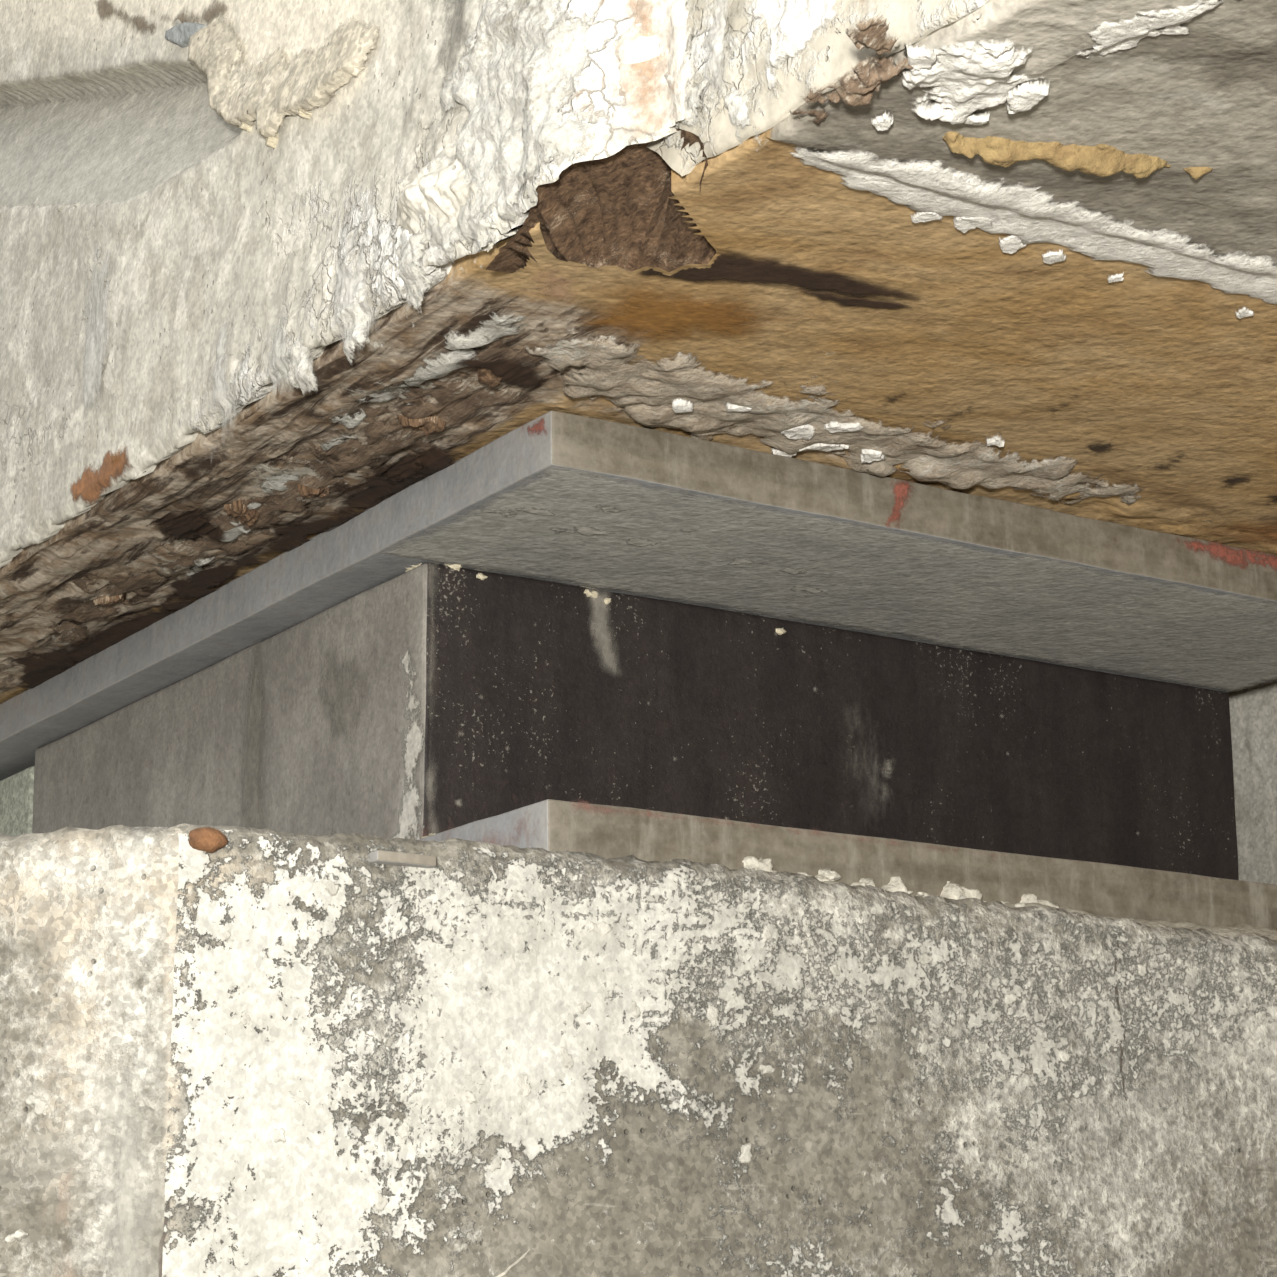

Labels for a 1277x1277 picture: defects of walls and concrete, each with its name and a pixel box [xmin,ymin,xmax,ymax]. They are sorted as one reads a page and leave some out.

spalling [0,15,379,215]
damp [630,0,766,150]
damp [751,0,837,90]
damp [640,253,917,309]
rust [71,448,130,505]
peeling [396,414,446,436]
peeling [477,368,502,388]
damp [457,327,1142,505]
peeling [93,592,126,605]
damp [10,446,461,688]
damp [389,469,1277,690]
peeling [162,830,1277,1277]